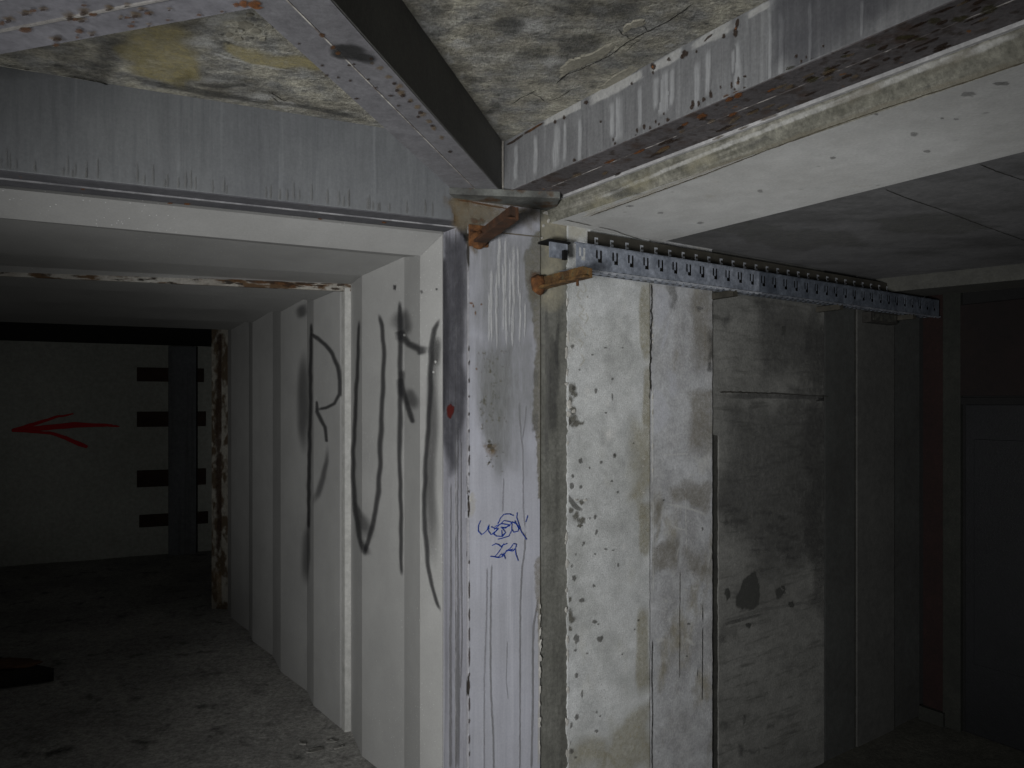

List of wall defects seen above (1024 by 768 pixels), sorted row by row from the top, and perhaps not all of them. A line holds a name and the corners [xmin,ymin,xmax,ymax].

corrosion [66,4,152,38]
water stain [67,9,340,115]
corrosion [221,0,263,12]
crack [512,4,692,104]
corrosion [651,19,739,74]
corrosion [767,0,987,96]
corrosion [634,75,787,158]
corrosion [229,279,344,290]
water stain [724,572,760,628]